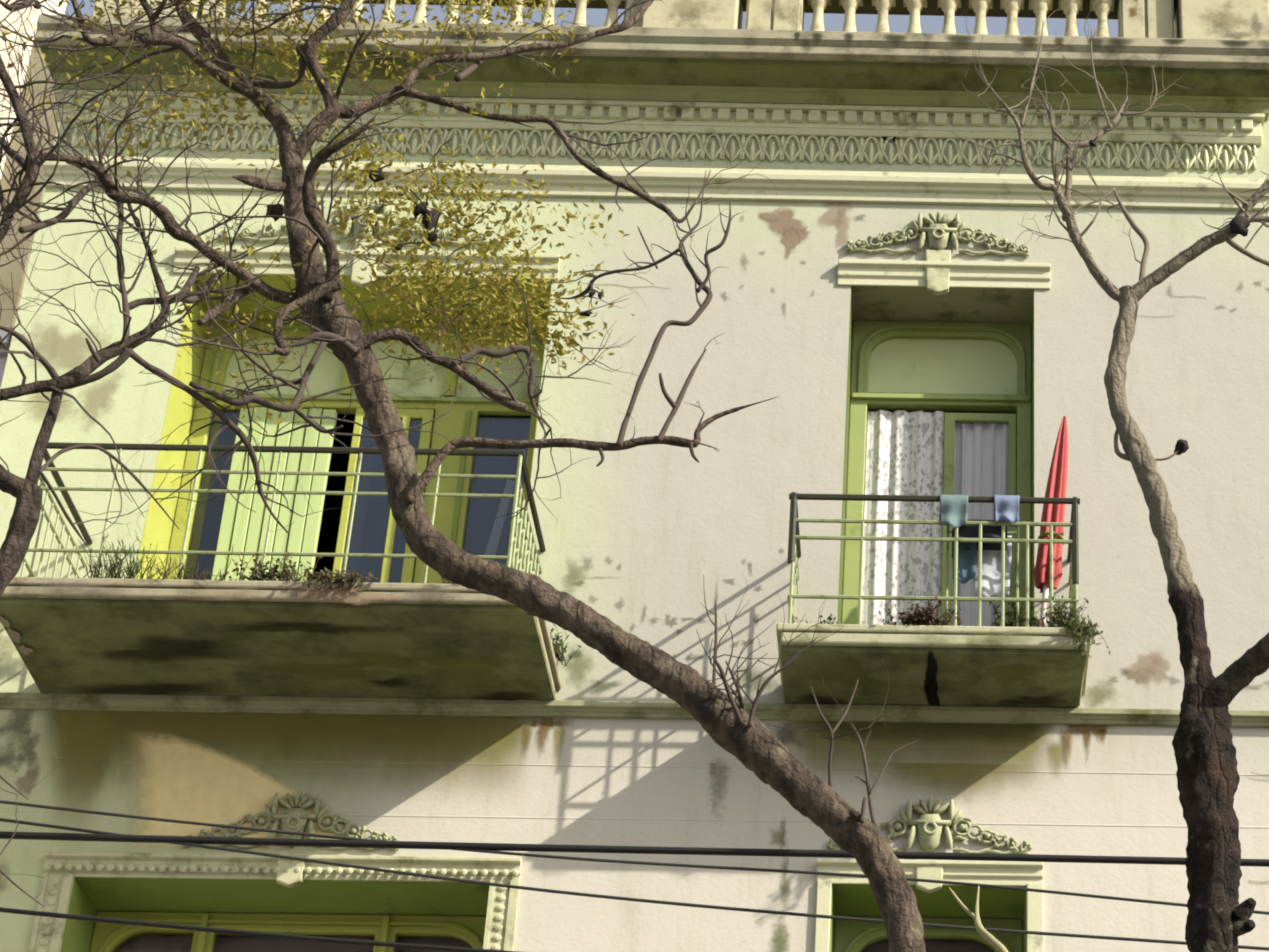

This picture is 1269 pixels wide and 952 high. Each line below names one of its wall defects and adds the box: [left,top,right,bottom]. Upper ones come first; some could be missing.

peeling [761,209,808,257]
peeling [823,202,863,242]
water stain [247,623,367,634]
water stain [108,639,220,660]
water stain [85,685,200,694]
water stain [487,693,534,701]
water stain [802,696,843,705]
crack [924,651,940,706]
water stain [1002,697,1059,706]
peeling [1127,654,1167,682]
corrosion [522,718,565,748]
corrosion [1050,725,1106,763]